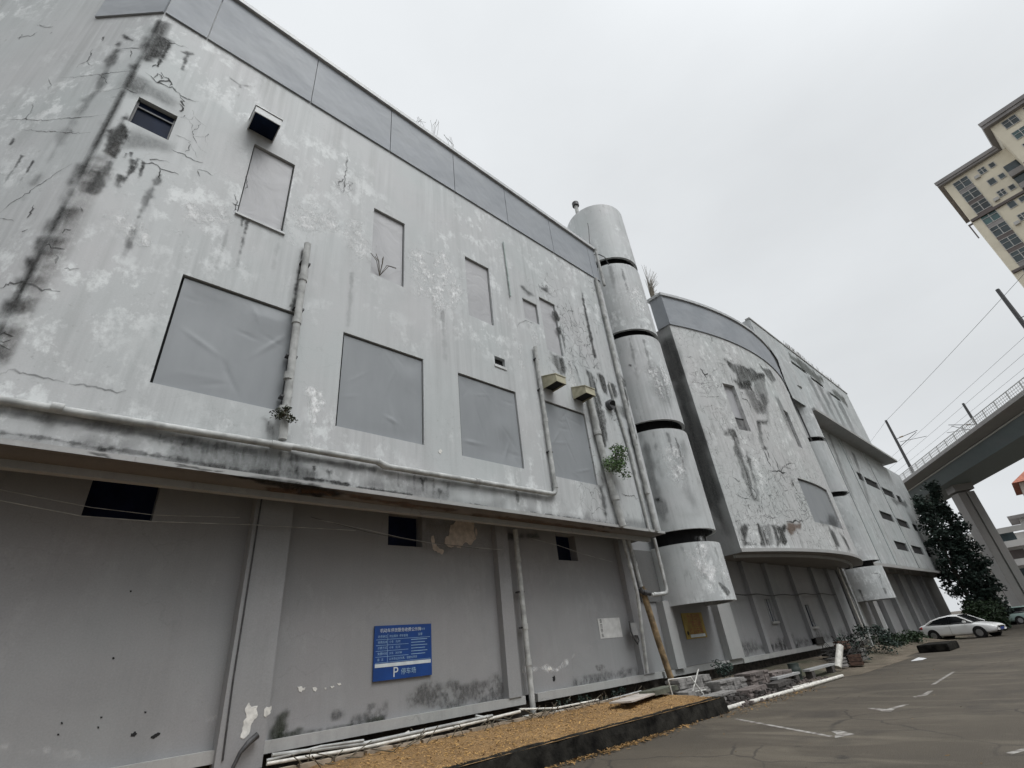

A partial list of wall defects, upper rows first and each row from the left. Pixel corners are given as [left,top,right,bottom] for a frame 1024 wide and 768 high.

leakage [78,21,171,193]
crack [87,37,211,177]
leakage [5,207,76,312]
leakage [587,371,629,447]
leakage [727,361,775,433]
leakage [299,462,408,496]
flaking render [431,521,477,555]
leakage [741,524,787,546]
leakage [413,677,503,708]
peeling [240,703,272,739]
mould [271,714,300,740]